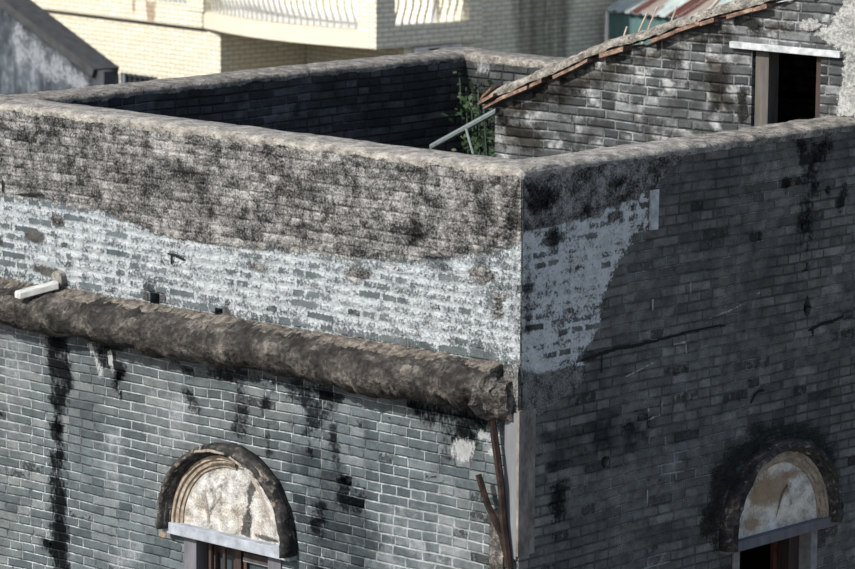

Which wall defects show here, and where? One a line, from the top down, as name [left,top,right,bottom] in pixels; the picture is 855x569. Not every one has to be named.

peeling [841,76,855,106]
flaking render [0,110,696,417]
damp [782,132,832,272]
damp [41,335,74,569]
damp [89,342,127,400]
damp [171,360,365,538]
damp [406,400,489,460]
crack [576,324,725,373]